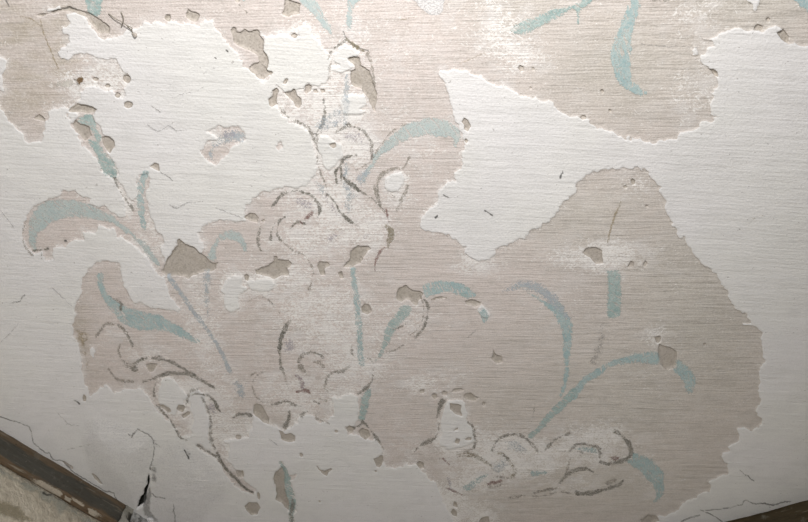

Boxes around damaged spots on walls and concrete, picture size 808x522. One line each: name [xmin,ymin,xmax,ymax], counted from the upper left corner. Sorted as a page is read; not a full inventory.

spalling [186,9,200,22]
peeling [0,0,131,172]
spalling [231,27,273,82]
spalling [285,89,302,108]
peeling [333,45,359,73]
spalling [348,56,377,111]
peeling [317,136,343,170]
peeling [385,172,404,192]
peeling [22,162,165,261]
spalling [161,239,218,279]
peeling [440,400,474,450]
crack [128,429,176,521]